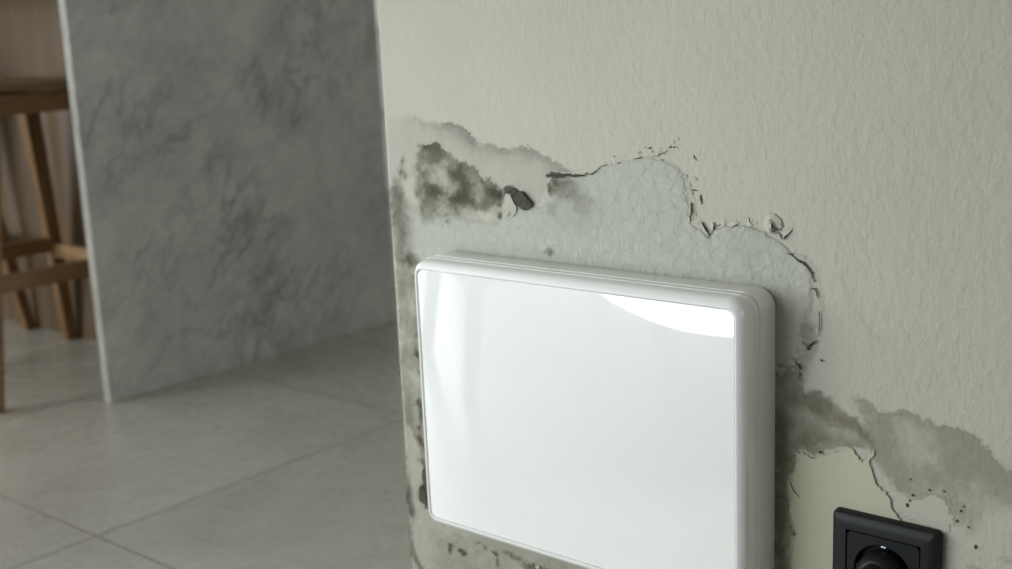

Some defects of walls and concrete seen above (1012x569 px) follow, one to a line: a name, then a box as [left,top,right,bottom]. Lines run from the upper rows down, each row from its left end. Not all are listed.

leakage [390,175,418,266]
leakage [416,142,503,221]
flaking render [402,159,811,374]
leakage [405,395,425,465]
leakage [775,374,1012,569]
leakage [405,472,423,569]